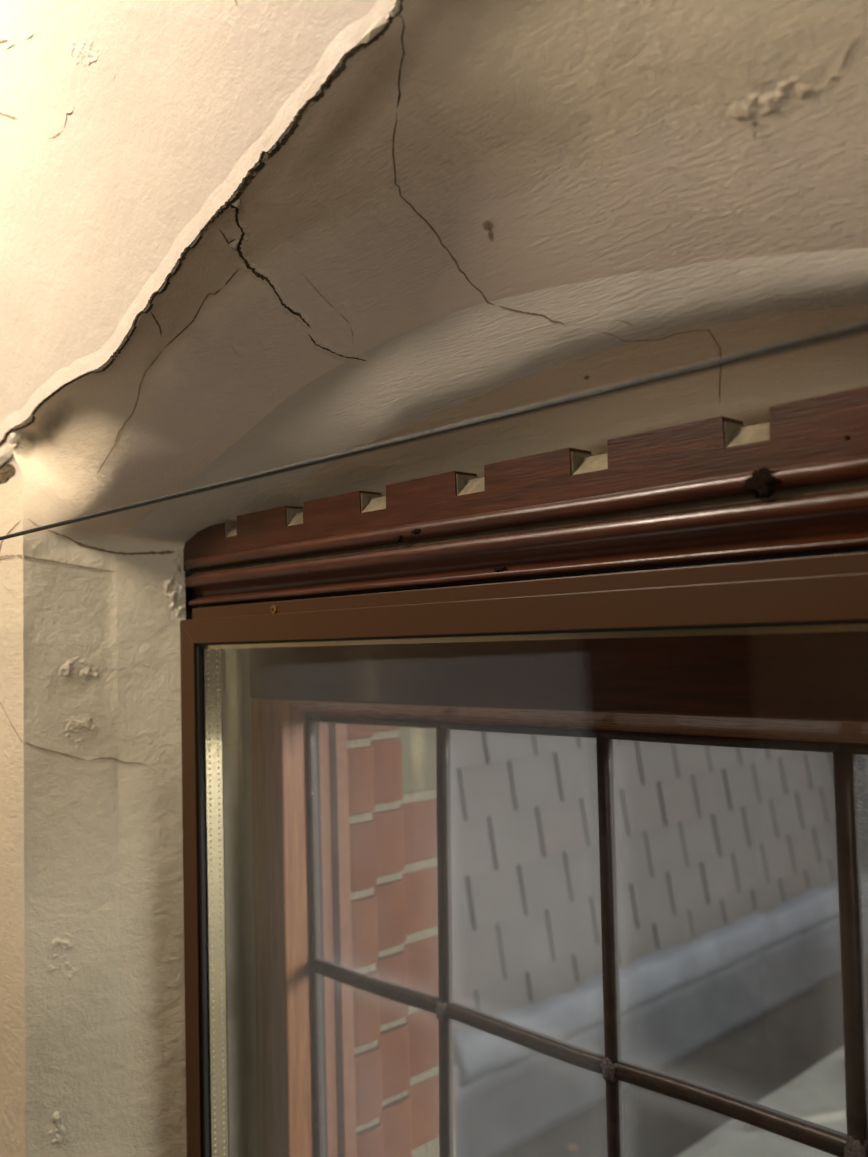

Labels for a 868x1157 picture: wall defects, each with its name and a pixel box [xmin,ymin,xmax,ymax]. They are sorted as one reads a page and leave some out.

crack [0,0,566,475]
crack [595,320,722,403]
crack [0,519,175,572]
crack [0,702,148,766]